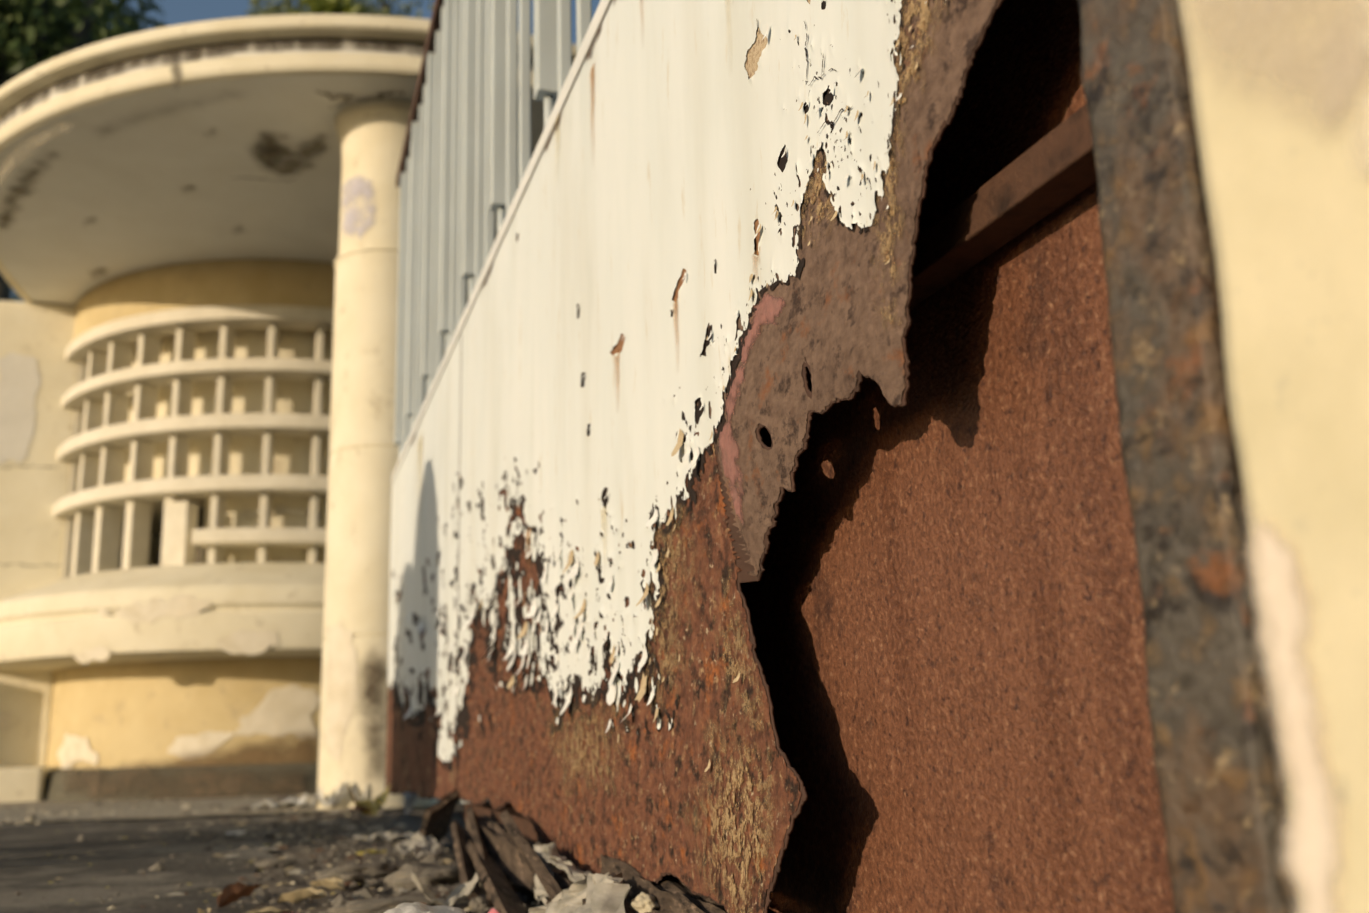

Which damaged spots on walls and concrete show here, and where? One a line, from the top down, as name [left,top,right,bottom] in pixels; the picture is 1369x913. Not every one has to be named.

peeling [745,26,769,79]
peeling [805,86,834,112]
damp [0,125,69,227]
damp [255,134,325,175]
peeling [778,145,788,172]
peeling [670,268,686,317]
peeling [610,333,625,355]
peeling [701,325,712,356]
peeling [695,398,704,424]
rust [385,0,996,913]
peeling [167,622,359,763]
flaking render [1252,527,1339,913]